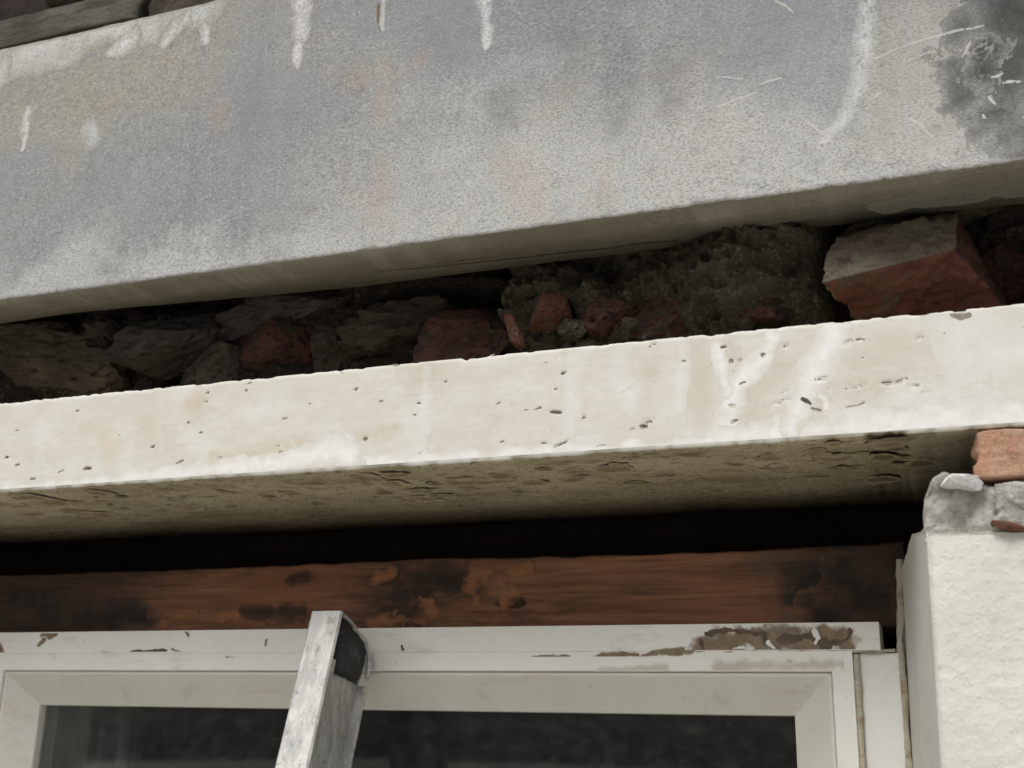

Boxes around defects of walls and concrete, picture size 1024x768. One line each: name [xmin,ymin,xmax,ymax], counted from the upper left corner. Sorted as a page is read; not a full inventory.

water stain [376,0,1024,214]
peeling [685,623,865,650]